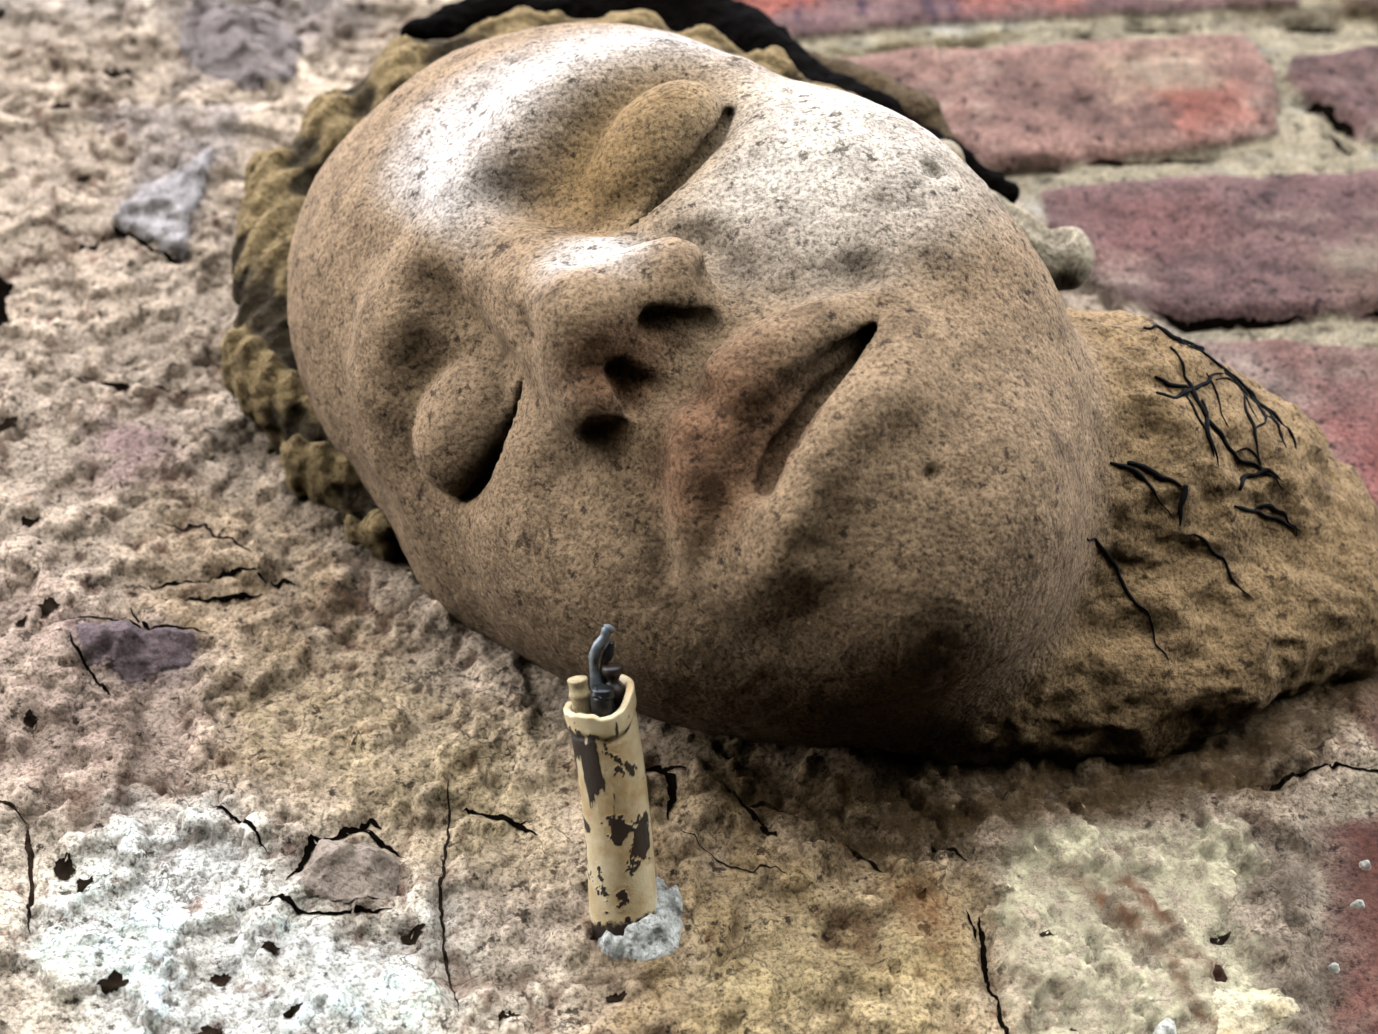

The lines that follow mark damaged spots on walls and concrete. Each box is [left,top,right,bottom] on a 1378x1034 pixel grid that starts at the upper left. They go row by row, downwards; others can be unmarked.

crack [49,522,297,695]
crack [0,800,35,934]
crack [212,805,404,915]
crack [438,781,538,1011]
crack [966,910,1009,1034]